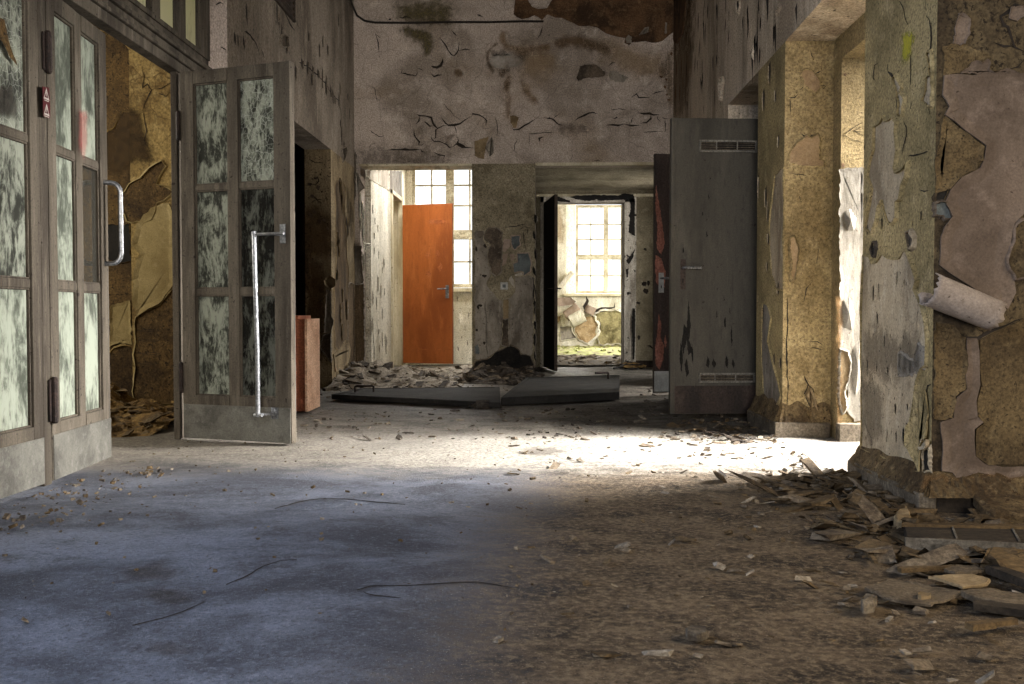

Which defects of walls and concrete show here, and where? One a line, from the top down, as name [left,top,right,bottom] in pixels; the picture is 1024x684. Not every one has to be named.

peeling [101,30,129,132]
crack [355,91,668,159]
peeling [512,0,776,111]
peeling [108,159,174,405]
peeling [457,214,538,368]
peeling [558,271,621,346]
peeling [837,12,1024,479]